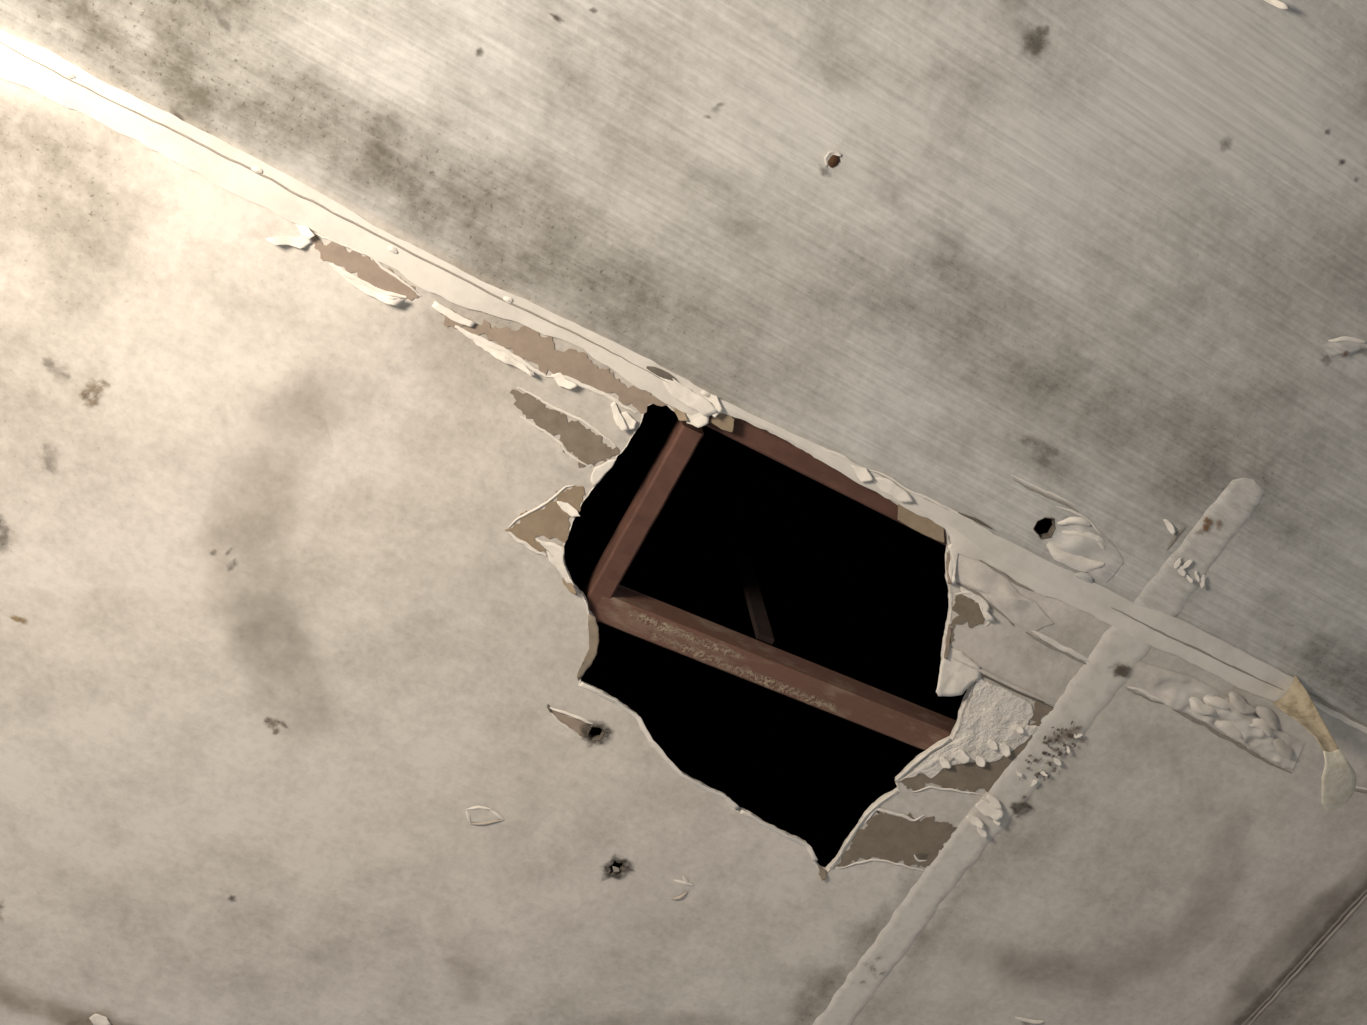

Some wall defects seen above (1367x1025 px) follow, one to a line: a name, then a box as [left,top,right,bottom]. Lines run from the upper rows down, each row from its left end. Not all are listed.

peeling [265,224,722,467]
peeling [505,484,585,556]
peeling [851,465,913,503]
peeling [950,586,997,643]
spalling [552,710,591,738]
flaking render [834,678,1083,872]